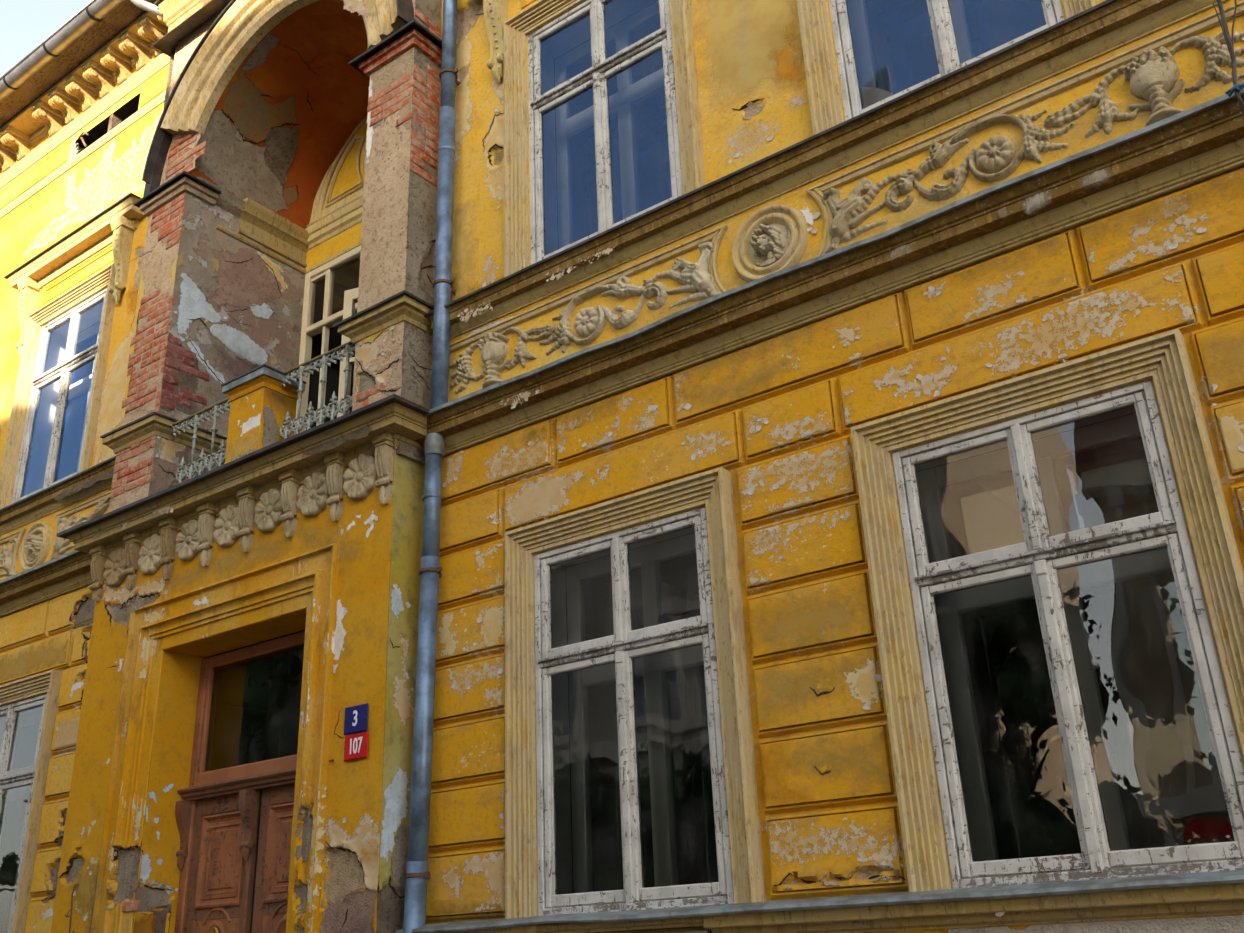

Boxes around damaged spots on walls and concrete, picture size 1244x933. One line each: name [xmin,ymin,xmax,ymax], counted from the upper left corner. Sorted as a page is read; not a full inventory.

flaking render [343,0,370,18]
flaking render [165,33,300,213]
flaking render [365,0,484,187]
flaking render [55,192,268,500]
flaking render [231,396,278,461]
peeling [483,393,663,528]
peeling [962,194,1209,385]
flaking render [54,579,168,773]
flaking render [33,784,178,933]
flaking render [294,767,411,933]
peeling [764,817,906,893]
flaking render [948,912,1244,933]